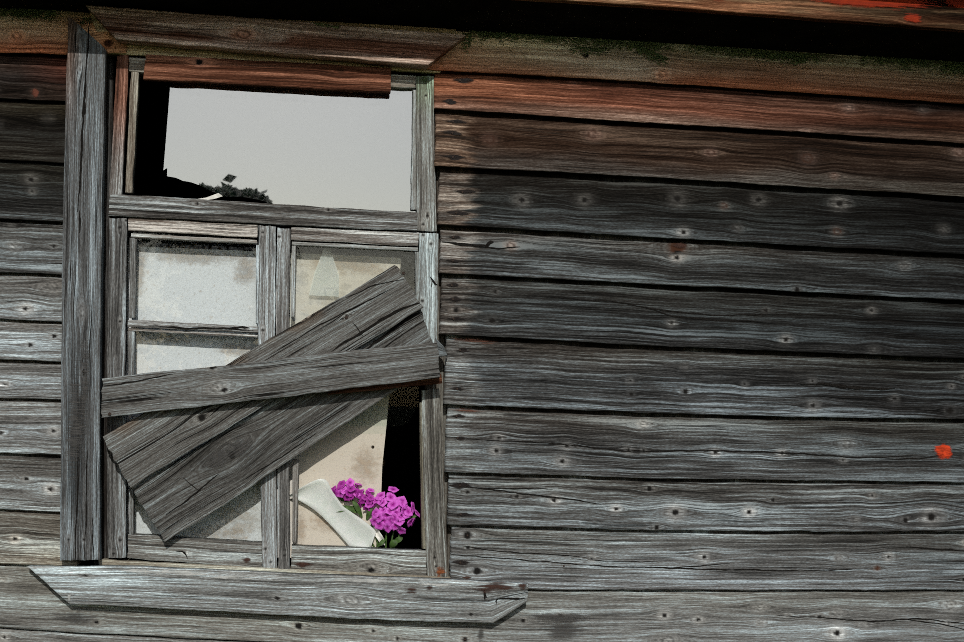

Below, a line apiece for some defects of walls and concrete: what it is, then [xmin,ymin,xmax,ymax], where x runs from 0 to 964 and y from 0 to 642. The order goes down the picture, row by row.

peeling [819,0,964,22]
crack [779,615,964,630]